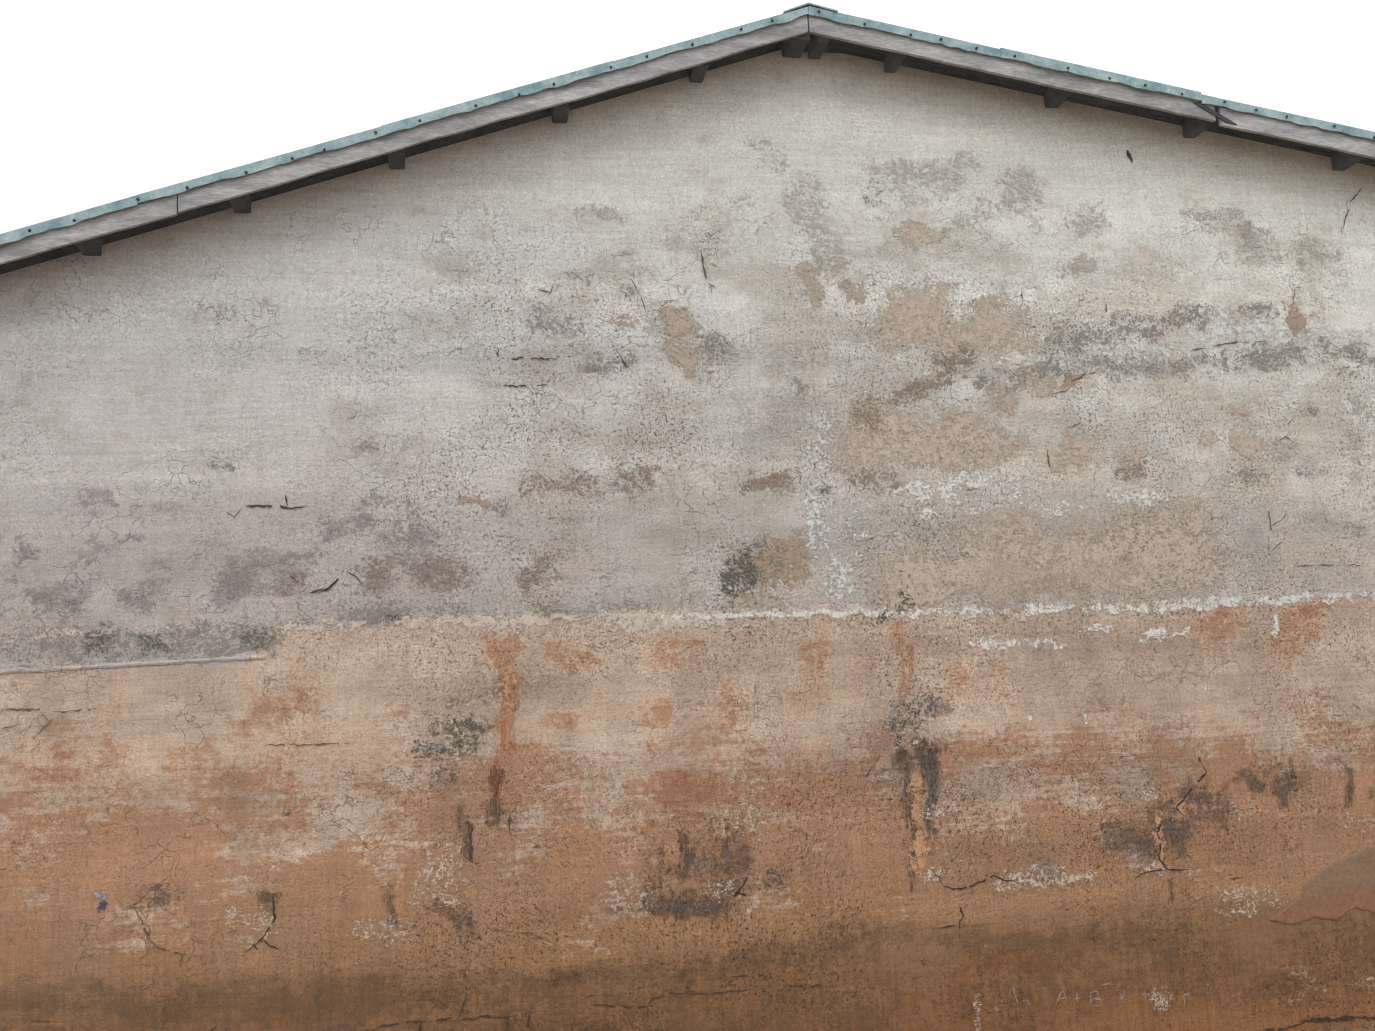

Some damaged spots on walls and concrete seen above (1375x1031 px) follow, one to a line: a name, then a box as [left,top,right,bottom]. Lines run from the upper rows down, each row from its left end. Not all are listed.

peeling [515,138,1375,651]
water stain [715,527,818,620]
water stain [876,581,914,624]
water stain [595,775,790,918]
crack [1136,754,1207,878]
crack [244,897,279,953]
crack [929,868,1020,939]
water stain [1209,883,1288,918]
crack [323,994,540,1031]
water stain [1148,986,1174,1011]